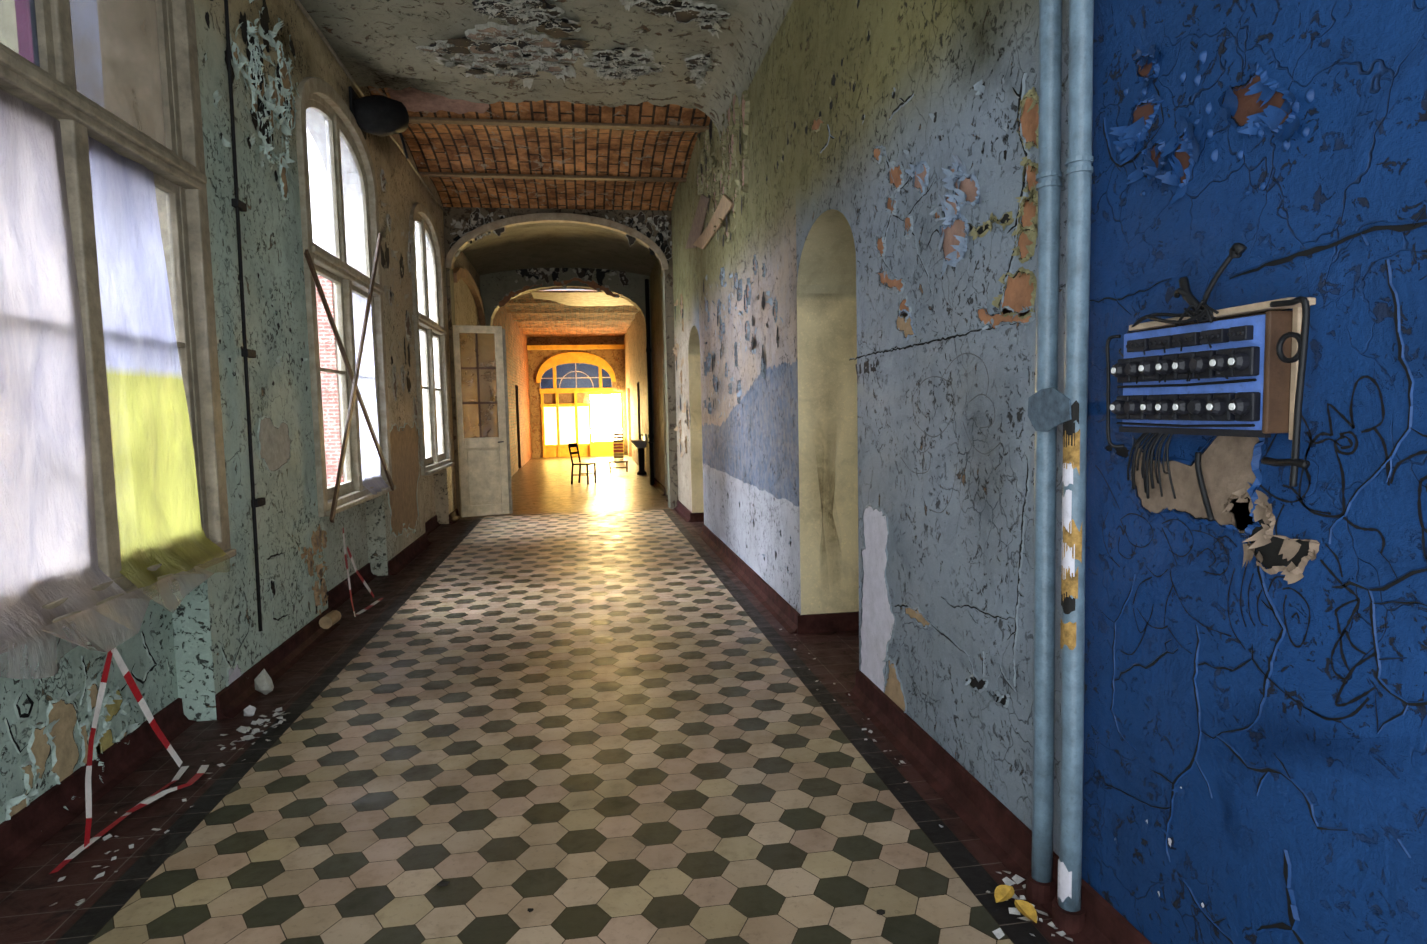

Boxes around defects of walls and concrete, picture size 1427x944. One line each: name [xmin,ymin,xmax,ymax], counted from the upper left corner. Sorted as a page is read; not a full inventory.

peeling [416,0,731,91]
peeling [696,90,750,247]
peeling [766,58,856,184]
crack [849,72,1030,361]
peeling [872,87,1039,341]
peeling [663,254,783,457]
peeling [860,503,932,713]
spalling [1103,436,1320,584]
crack [1332,549,1427,734]
crack [1098,550,1348,944]